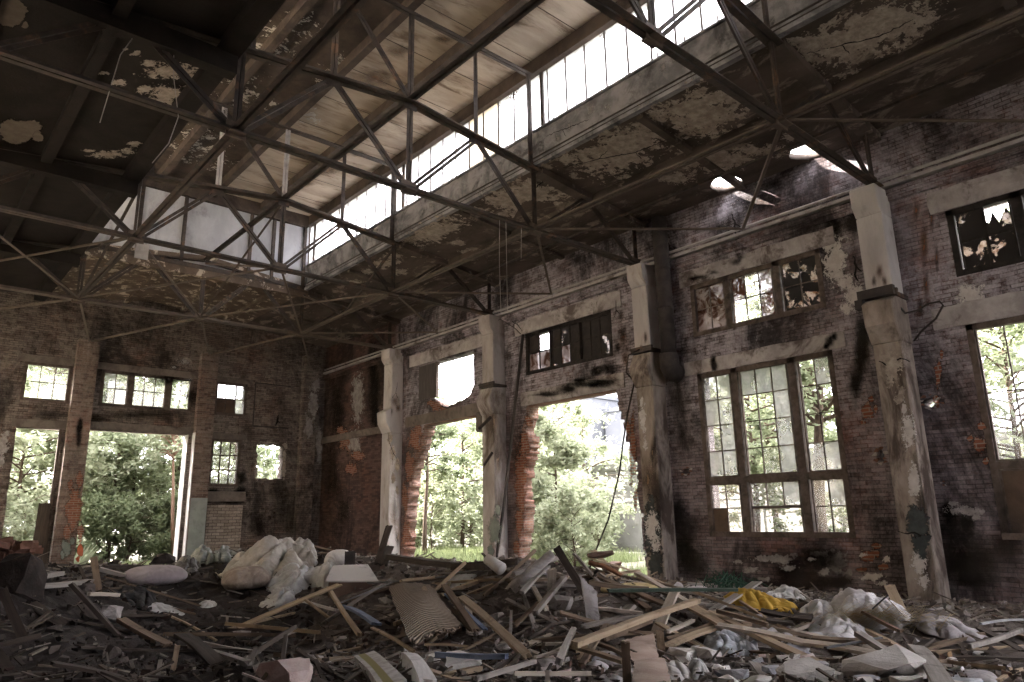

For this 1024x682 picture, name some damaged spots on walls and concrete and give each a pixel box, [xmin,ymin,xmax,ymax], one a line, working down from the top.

crack [807,19,913,54]
peeling [786,0,956,84]
peeling [99,48,199,105]
peeling [0,118,45,145]
peeling [84,141,143,159]
peeling [476,78,794,218]
peeling [821,228,866,315]
water stain [858,319,868,352]
water stain [850,372,861,399]
peeling [624,397,664,577]
peeling [885,347,944,591]
water stain [923,554,932,578]